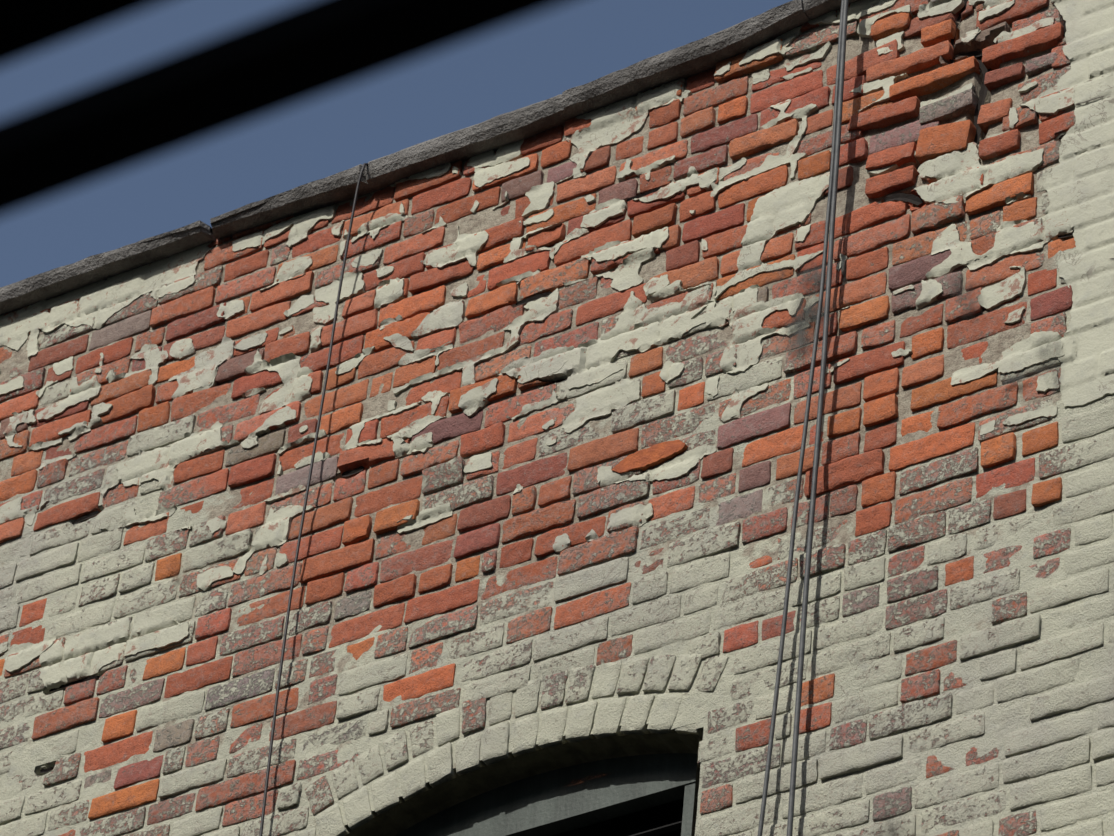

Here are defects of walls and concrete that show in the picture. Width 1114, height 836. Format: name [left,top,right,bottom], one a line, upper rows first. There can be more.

peeling [714,0,1015,84]
peeling [851,73,908,113]
crack [950,0,995,143]
peeling [914,80,1075,205]
peeling [994,17,1055,44]
peeling [0,79,830,498]
peeling [893,206,1074,324]
peeling [951,331,1064,436]
peeling [196,485,314,591]
peeling [397,503,454,534]
peeling [585,503,654,542]
peeling [0,614,190,690]